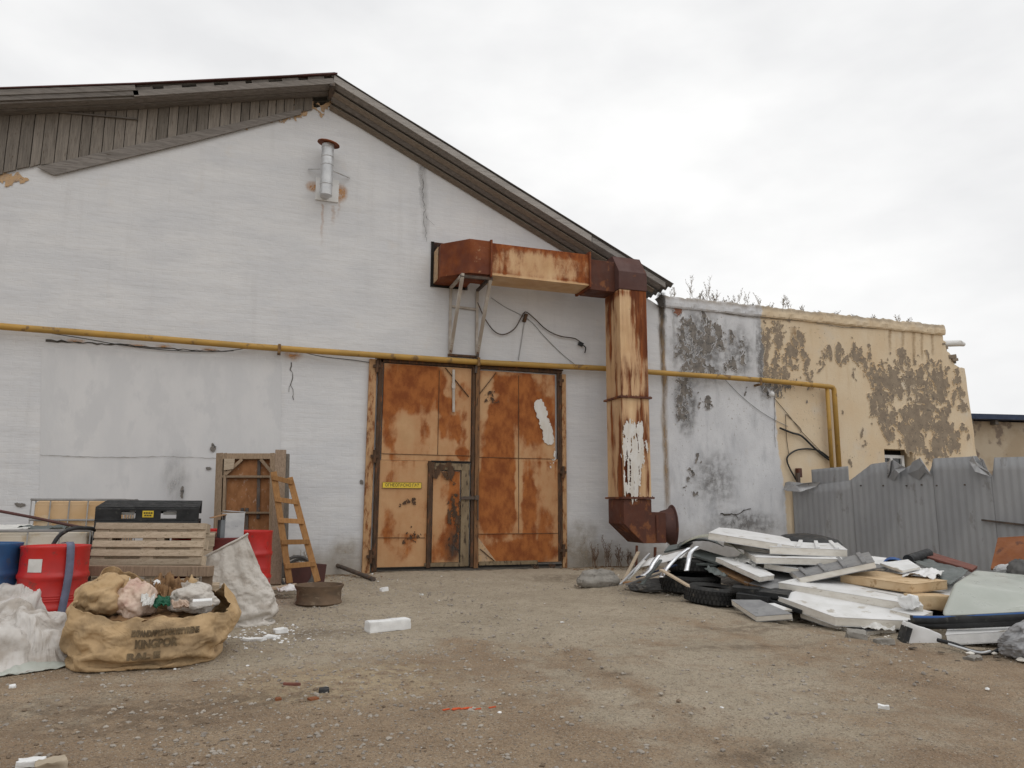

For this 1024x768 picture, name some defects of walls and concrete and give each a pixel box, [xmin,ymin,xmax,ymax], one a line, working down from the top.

flaking render [0,170,29,187]
flaking render [672,308,747,422]
flaking render [760,320,970,465]